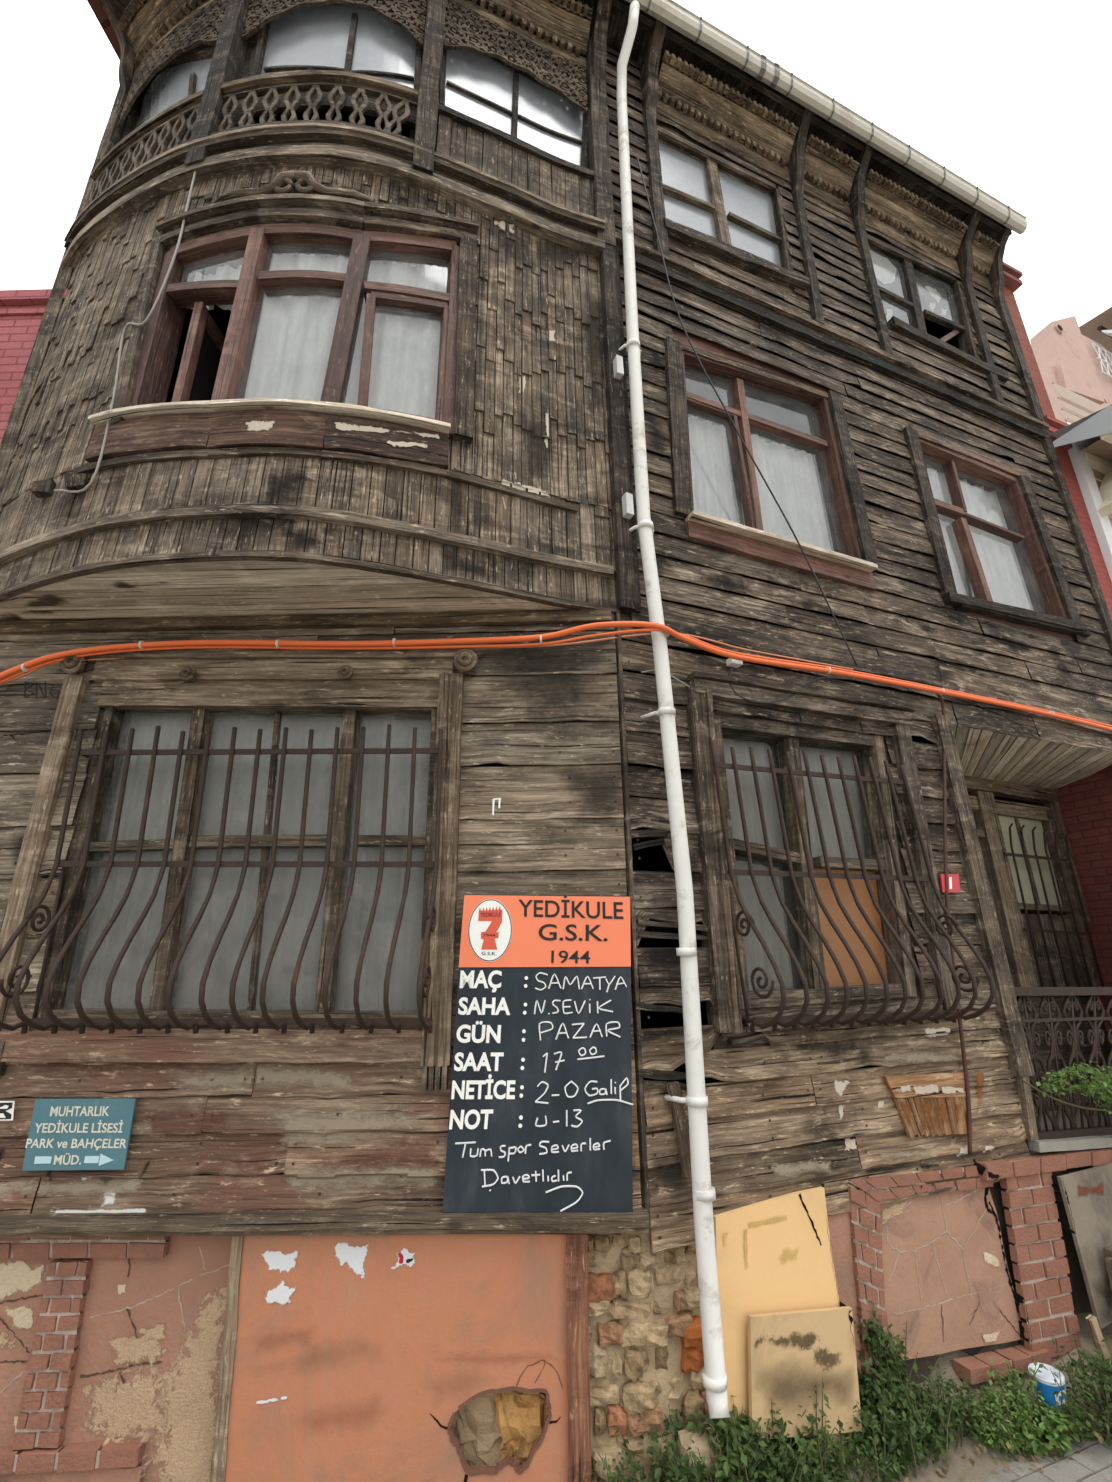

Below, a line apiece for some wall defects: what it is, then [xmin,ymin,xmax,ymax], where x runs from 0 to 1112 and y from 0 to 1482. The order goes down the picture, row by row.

peeling [245,420,275,432]
peeling [335,422,439,448]
peeling [901,1083,964,1095]
peeling [0,1259,44,1349]
crack [799,1184,854,1340]
crack [973,1159,1032,1342]
spalling [81,1287,227,1482]
spalling [447,1386,552,1476]